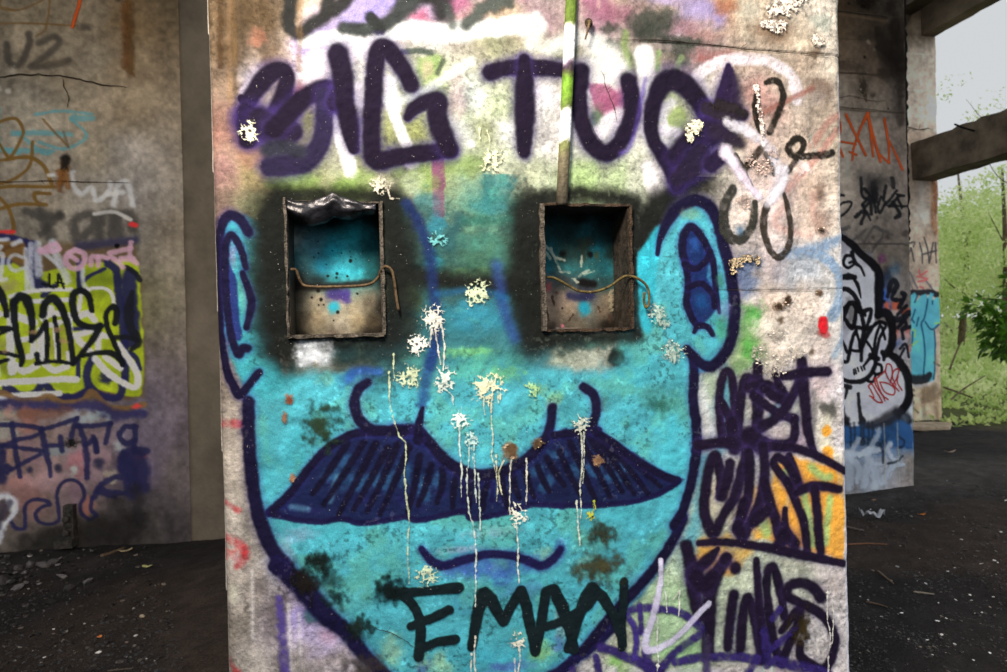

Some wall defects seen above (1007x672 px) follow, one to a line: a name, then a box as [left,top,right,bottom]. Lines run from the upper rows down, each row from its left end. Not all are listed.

peeling [759,0,807,34]